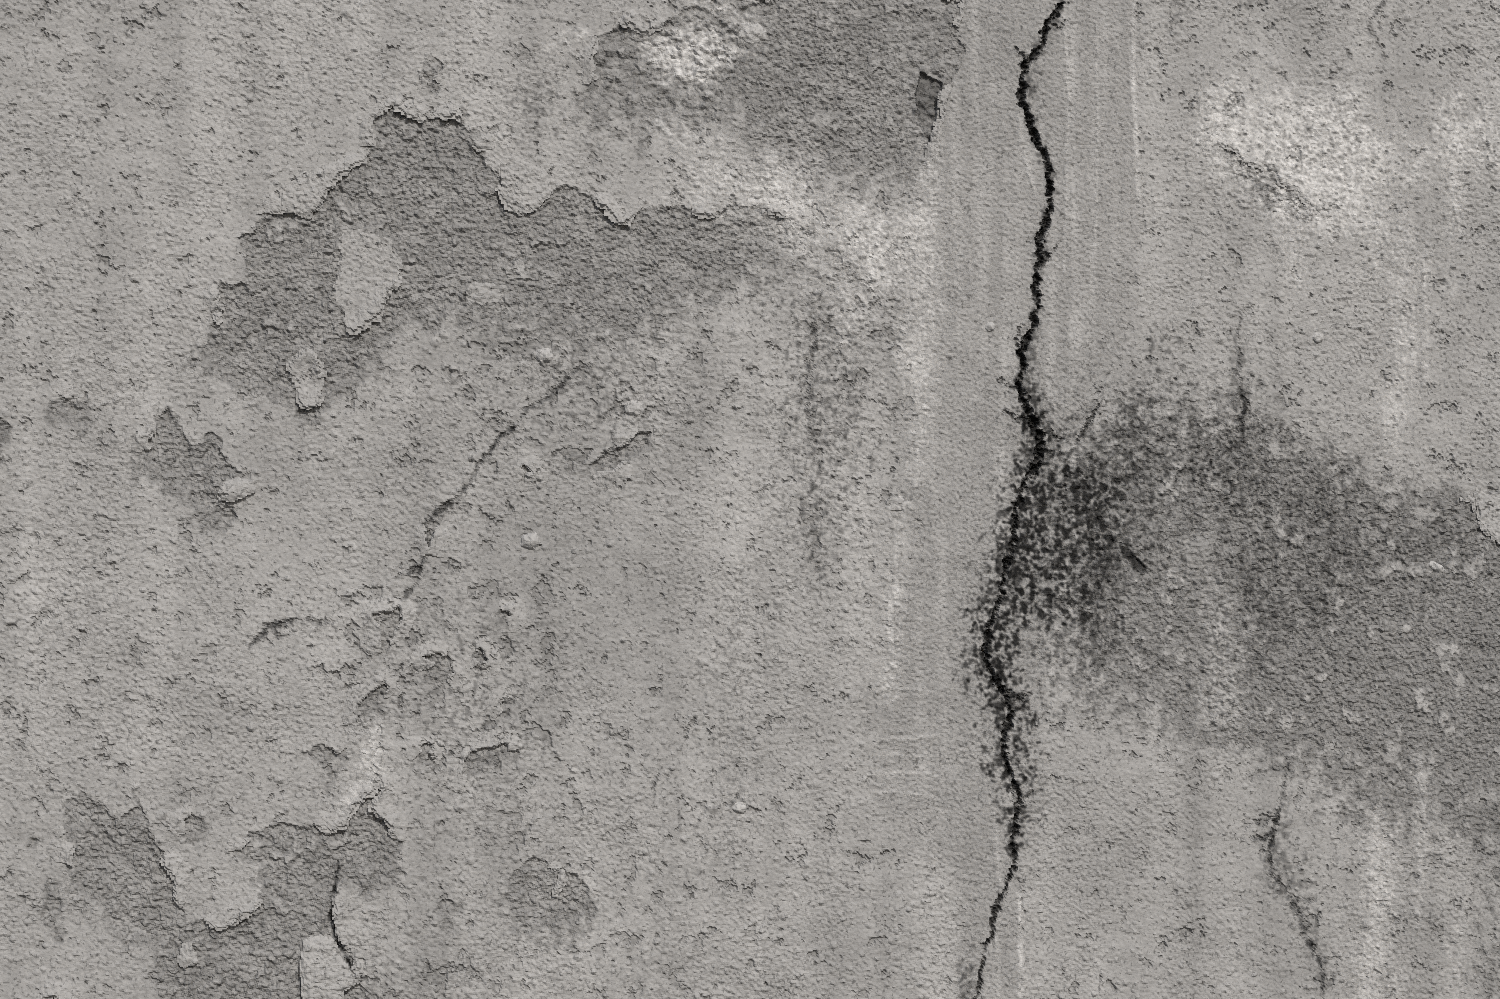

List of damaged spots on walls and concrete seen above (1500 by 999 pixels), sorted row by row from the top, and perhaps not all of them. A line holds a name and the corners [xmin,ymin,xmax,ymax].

peeling [187,0,965,425]
peeling [27,596,526,999]
crack [978,2,1064,988]
mould [961,373,1125,860]